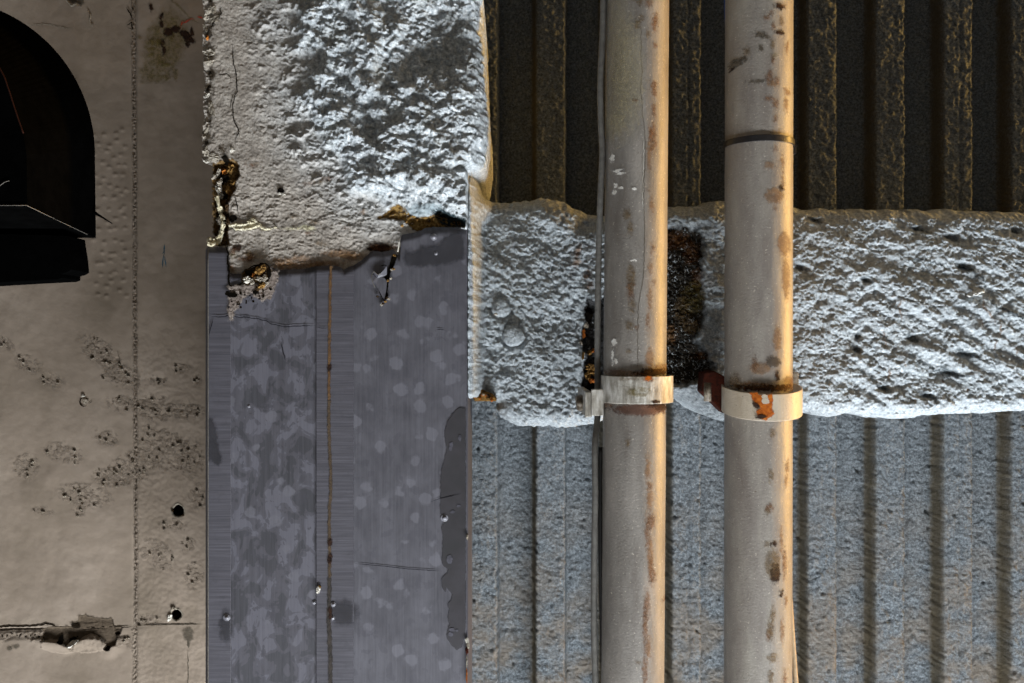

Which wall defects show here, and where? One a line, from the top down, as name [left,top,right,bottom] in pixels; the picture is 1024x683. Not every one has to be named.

rust [728,3,785,83]
crack [216,44,239,144]
spalling [378,202,465,231]
spalling [225,263,279,321]
rust [604,368,667,417]
rust [730,357,793,437]
leakage [440,408,466,650]
rust [765,541,787,597]
spalling [0,614,130,654]
crack [0,623,199,631]